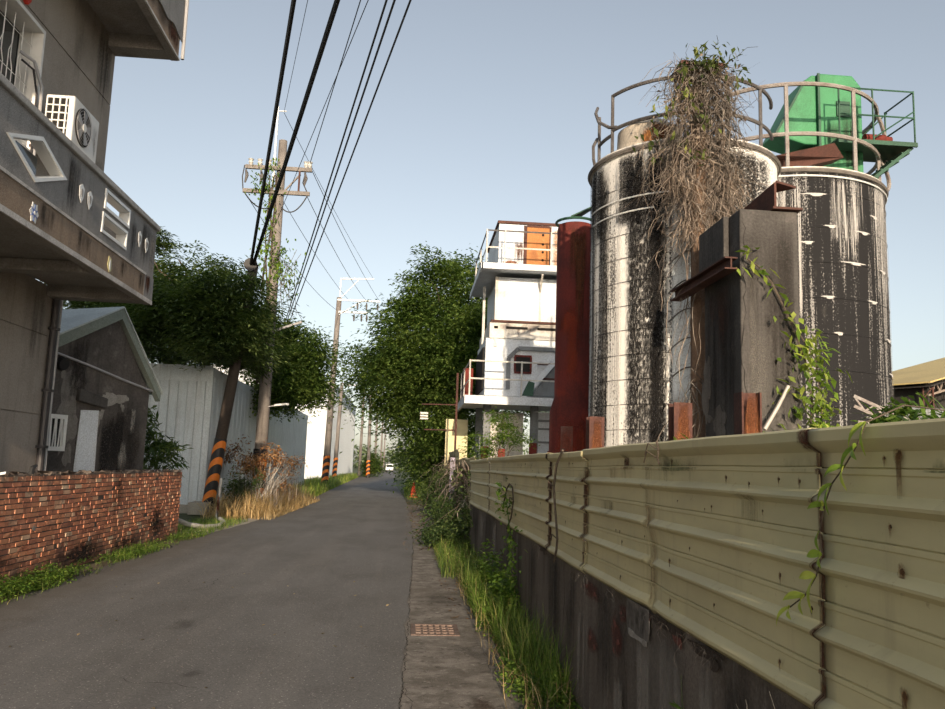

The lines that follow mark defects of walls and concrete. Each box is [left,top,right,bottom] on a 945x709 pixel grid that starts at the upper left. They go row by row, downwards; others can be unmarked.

water stain [590,151,680,444]
water stain [771,186,802,336]
water stain [833,182,858,257]
water stain [874,196,891,316]
peeling [98,392,129,426]
rust [746,397,759,434]
rust [882,449,902,487]
water stain [63,541,95,562]
rust [798,429,827,709]